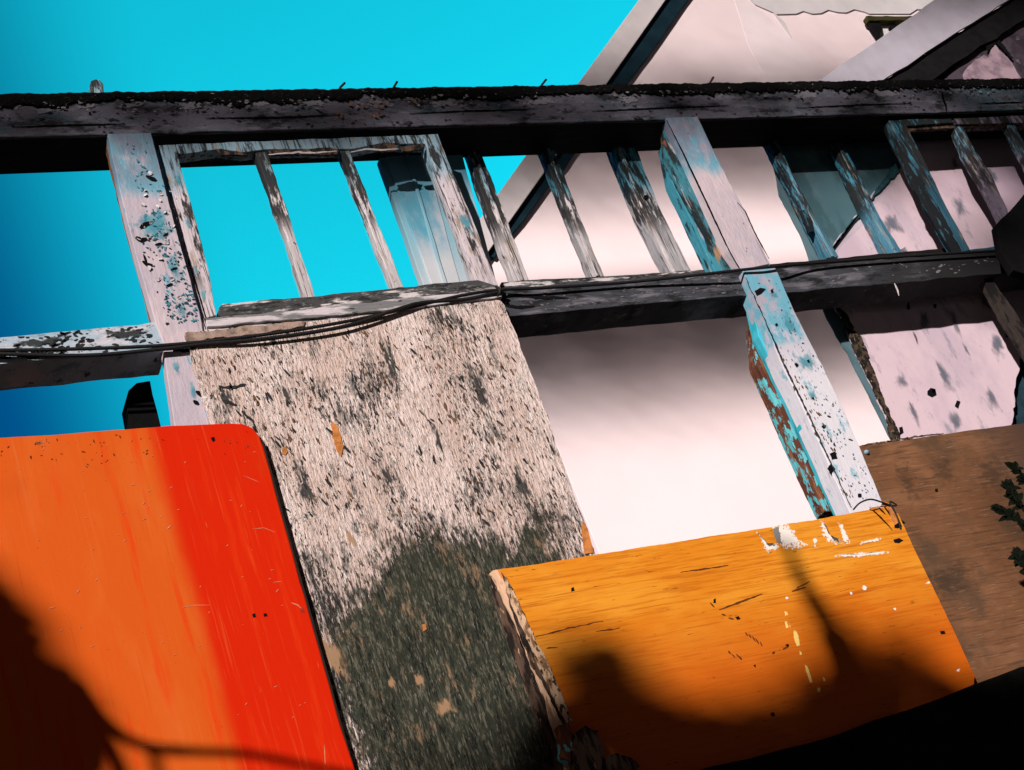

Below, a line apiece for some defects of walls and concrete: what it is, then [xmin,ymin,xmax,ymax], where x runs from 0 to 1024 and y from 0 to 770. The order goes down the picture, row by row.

peeling [141,205,205,325]
peeling [0,326,159,360]
spalling [780,307,944,499]
peeling [756,520,889,558]
damp [318,466,573,770]